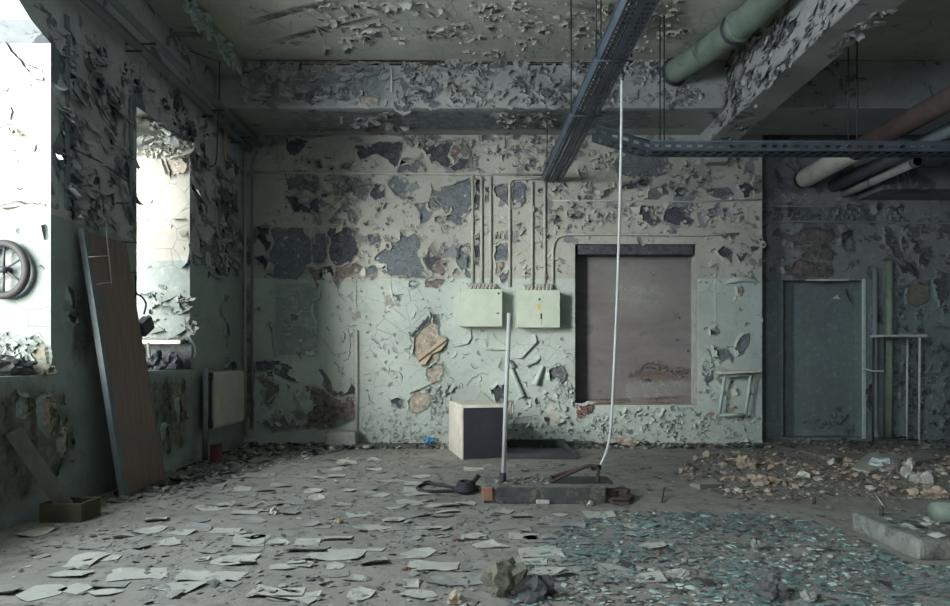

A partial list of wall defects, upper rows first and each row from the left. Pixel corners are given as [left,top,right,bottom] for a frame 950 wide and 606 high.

peeling [707,0,845,136]
peeling [831,9,899,48]
peeling [51,0,766,329]
spalling [254,311,456,443]
crack [254,143,619,437]
peeling [488,361,762,443]
peeling [698,326,751,400]
peeling [772,200,950,439]